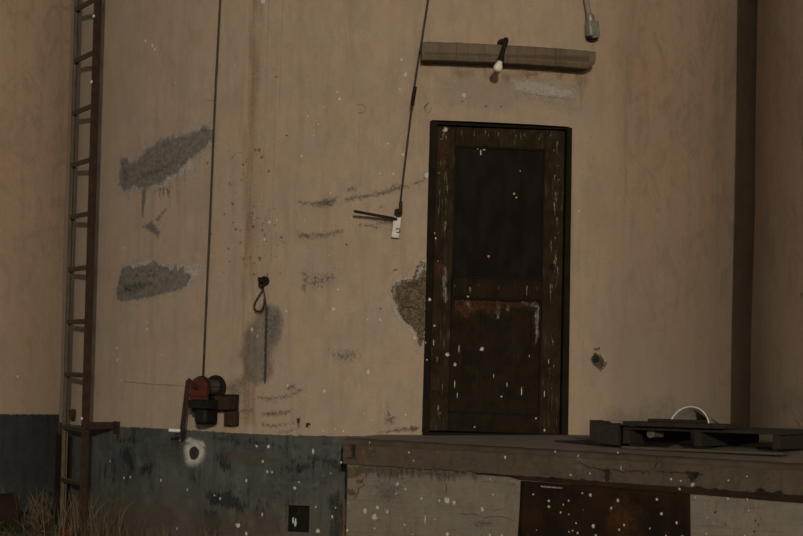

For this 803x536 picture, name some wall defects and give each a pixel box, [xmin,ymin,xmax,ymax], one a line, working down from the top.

water stain [242,306,280,382]
flaking render [391,260,456,366]
spalling [590,347,607,372]
rust [607,503,635,536]